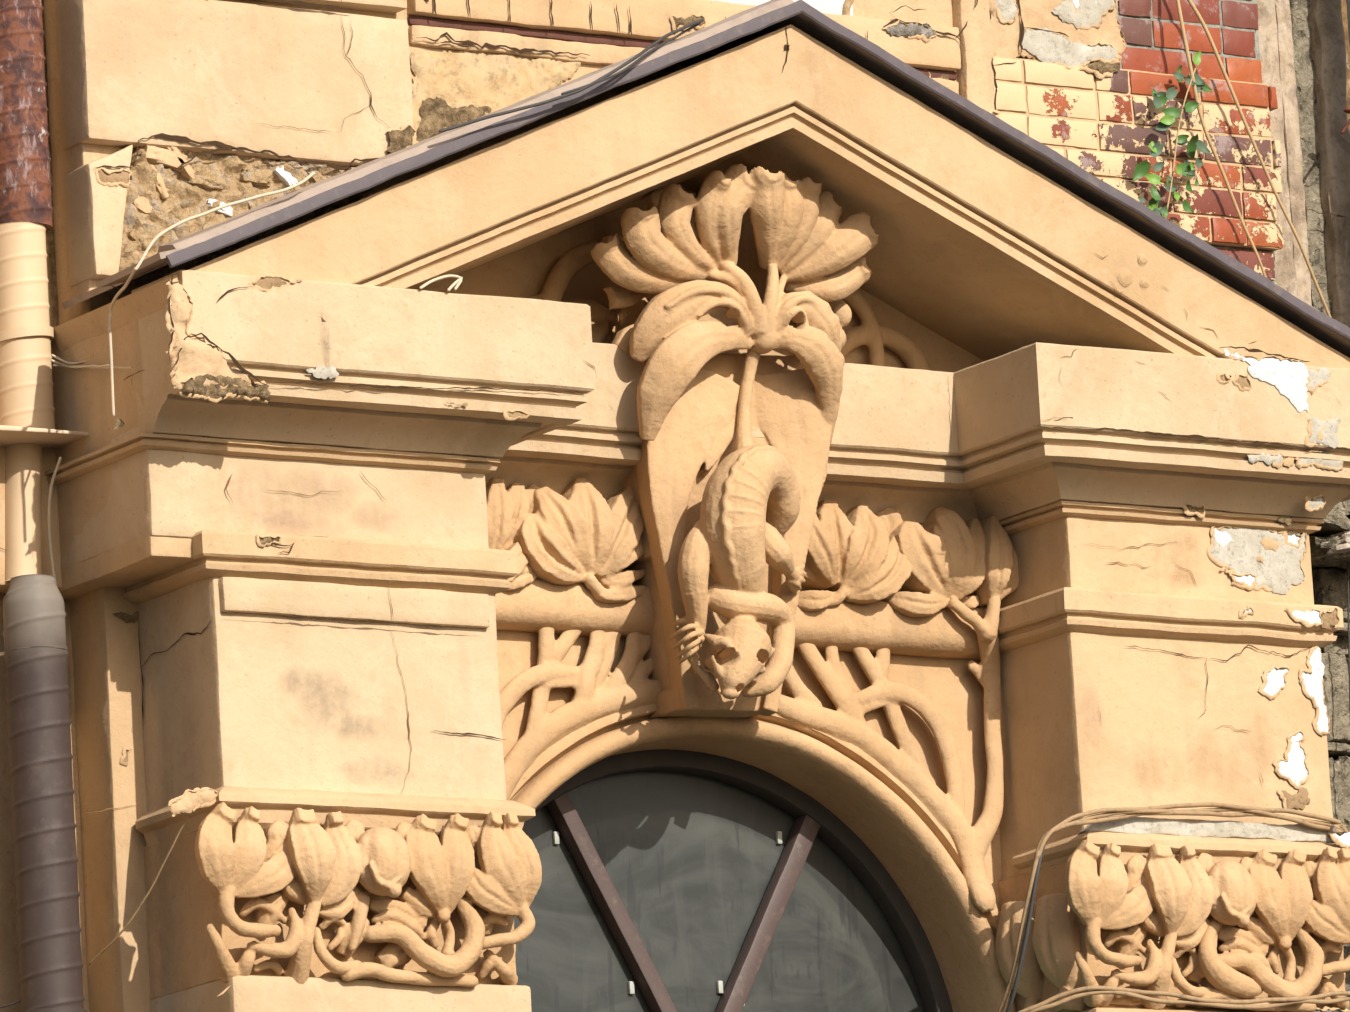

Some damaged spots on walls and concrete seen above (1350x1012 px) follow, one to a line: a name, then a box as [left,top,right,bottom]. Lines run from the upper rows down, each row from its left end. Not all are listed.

rust [0,0,53,232]
spalling [95,165,132,187]
crack [267,0,388,133]
flaking render [137,32,590,170]
peeling [994,0,1127,79]
spalling [165,279,271,404]
peeling [1216,349,1343,471]
peeling [1182,503,1340,629]
peeling [1305,494,1326,512]
crack [389,584,504,791]
crack [1126,645,1312,732]
peeling [1258,646,1330,809]